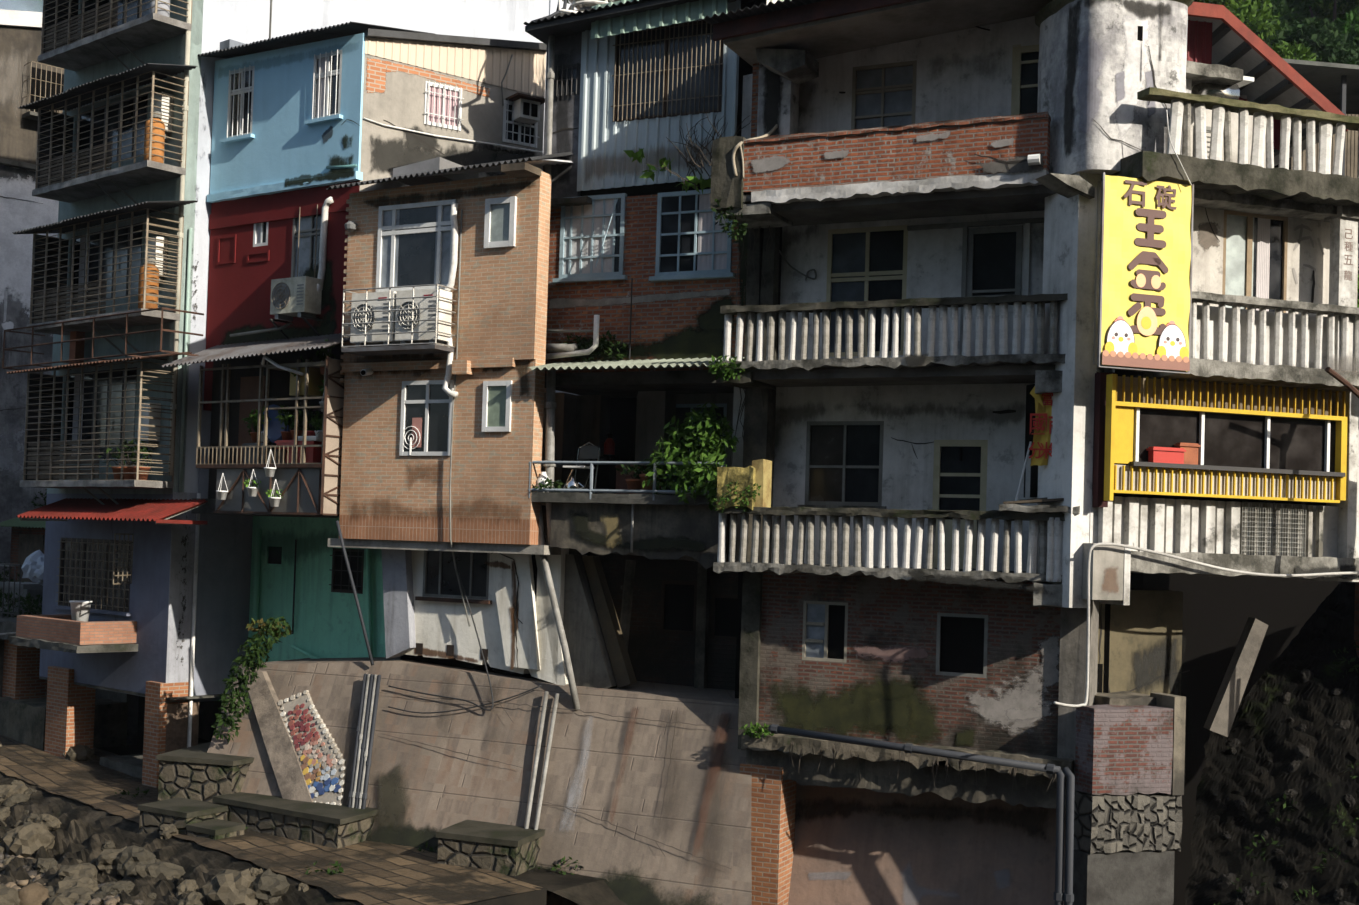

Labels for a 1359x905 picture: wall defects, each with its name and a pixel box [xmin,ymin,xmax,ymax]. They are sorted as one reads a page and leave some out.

crack [1148,46,1170,120]
leakage [285,135,354,187]
leakage [364,127,535,208]
peeling [824,150,849,159]
crack [1092,118,1142,151]